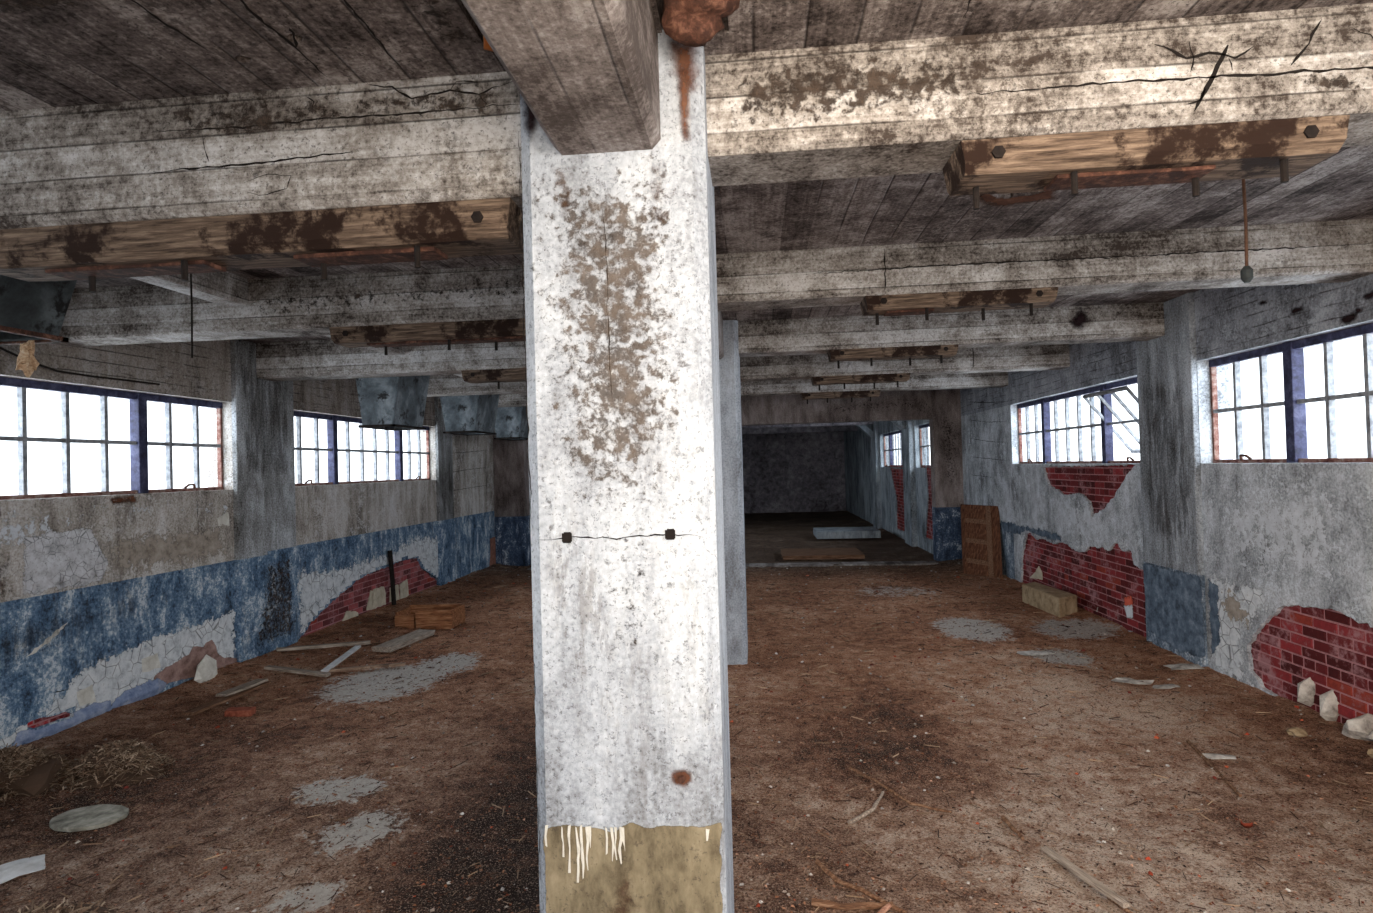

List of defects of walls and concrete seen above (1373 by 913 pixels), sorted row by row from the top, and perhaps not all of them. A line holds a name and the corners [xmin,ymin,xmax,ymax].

damp [260,157,708,504]
flaking render [297,534,438,638]
flaking render [1001,465,1373,724]
corrosion [672,770,691,786]
damp [616,882,633,913]